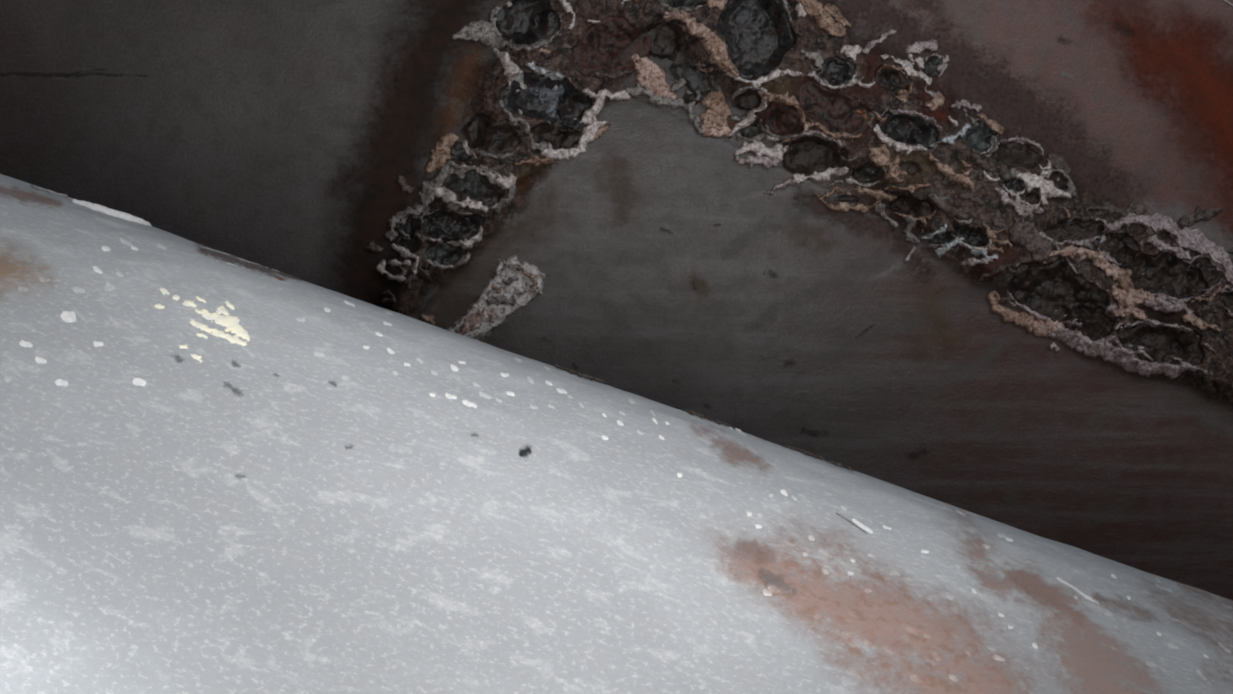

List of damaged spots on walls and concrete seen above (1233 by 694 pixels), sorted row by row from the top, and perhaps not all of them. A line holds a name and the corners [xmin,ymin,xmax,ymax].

rust [335,0,1233,379]
rust [730,540,1025,694]